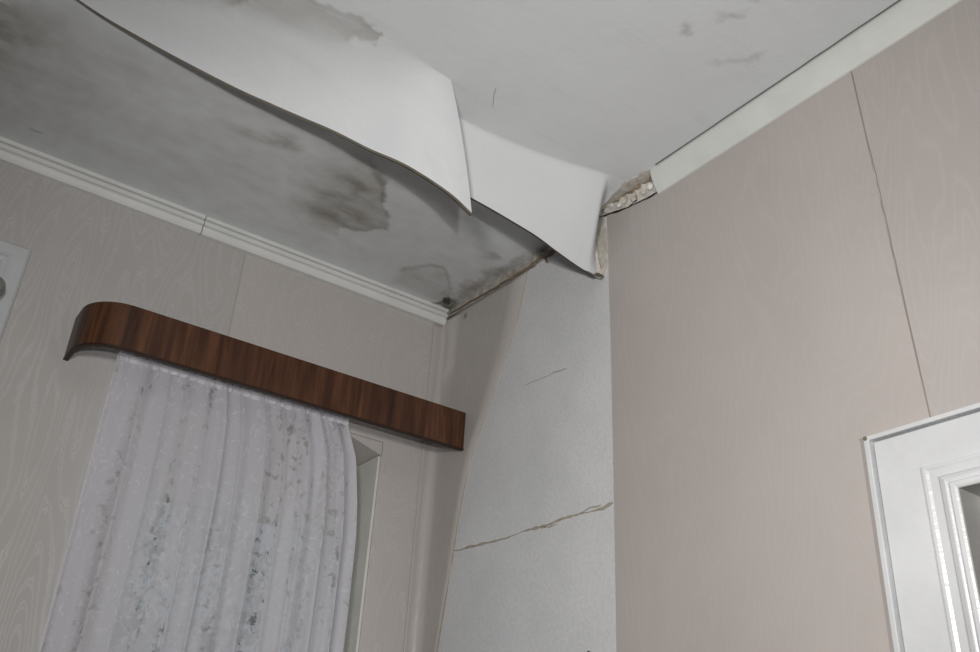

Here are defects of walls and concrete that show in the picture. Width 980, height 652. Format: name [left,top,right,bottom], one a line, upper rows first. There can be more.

spalling [595,169,657,275]
crack [454,502,613,551]